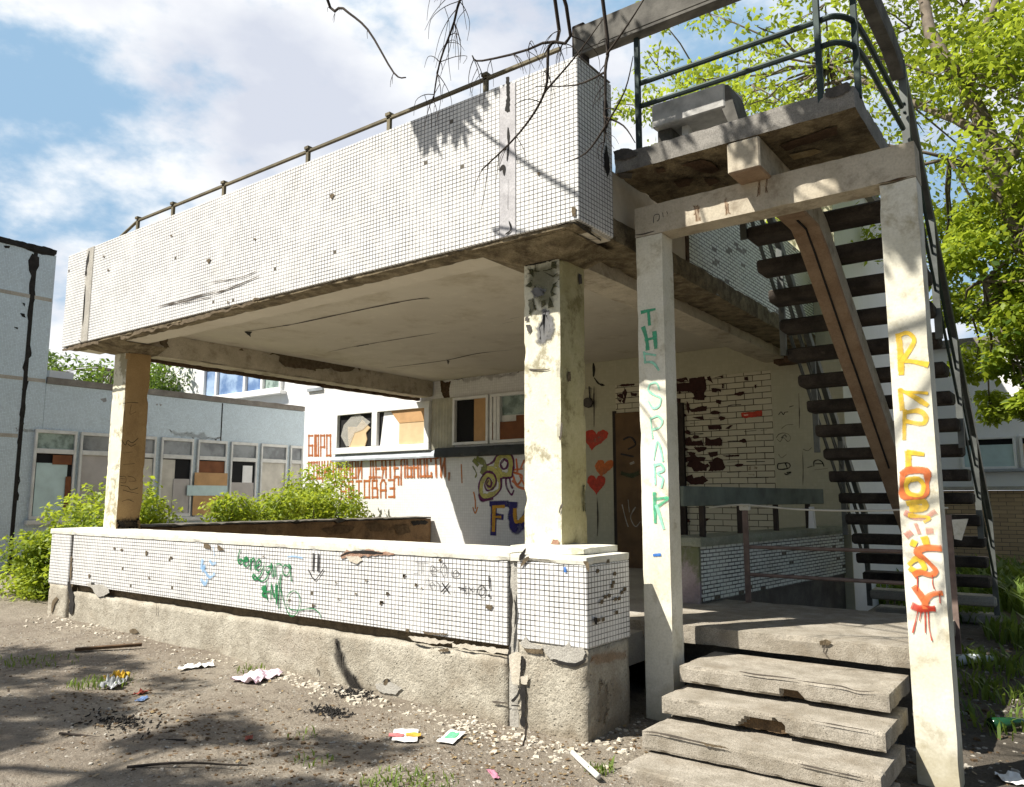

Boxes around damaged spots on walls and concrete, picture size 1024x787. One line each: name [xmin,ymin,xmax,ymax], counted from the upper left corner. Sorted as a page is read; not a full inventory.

peeling [525,309,555,344]
peeling [270,353,361,372]
peeling [676,375,756,485]
spalling [340,549,394,564]
peeling [520,637,585,663]
spalling [738,717,788,734]